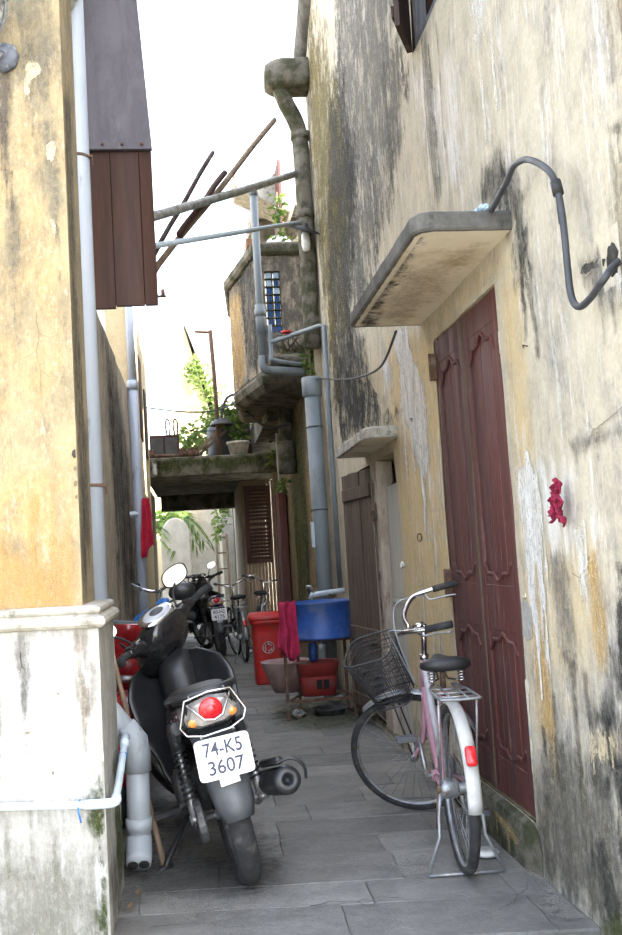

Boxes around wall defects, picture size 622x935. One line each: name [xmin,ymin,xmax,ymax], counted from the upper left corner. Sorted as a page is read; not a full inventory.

peeling [24,62,41,96]
peeling [46,141,56,162]
water stain [327,0,422,441]
water stain [16,636,30,720]
water stain [536,522,622,931]
water stain [0,845,123,935]